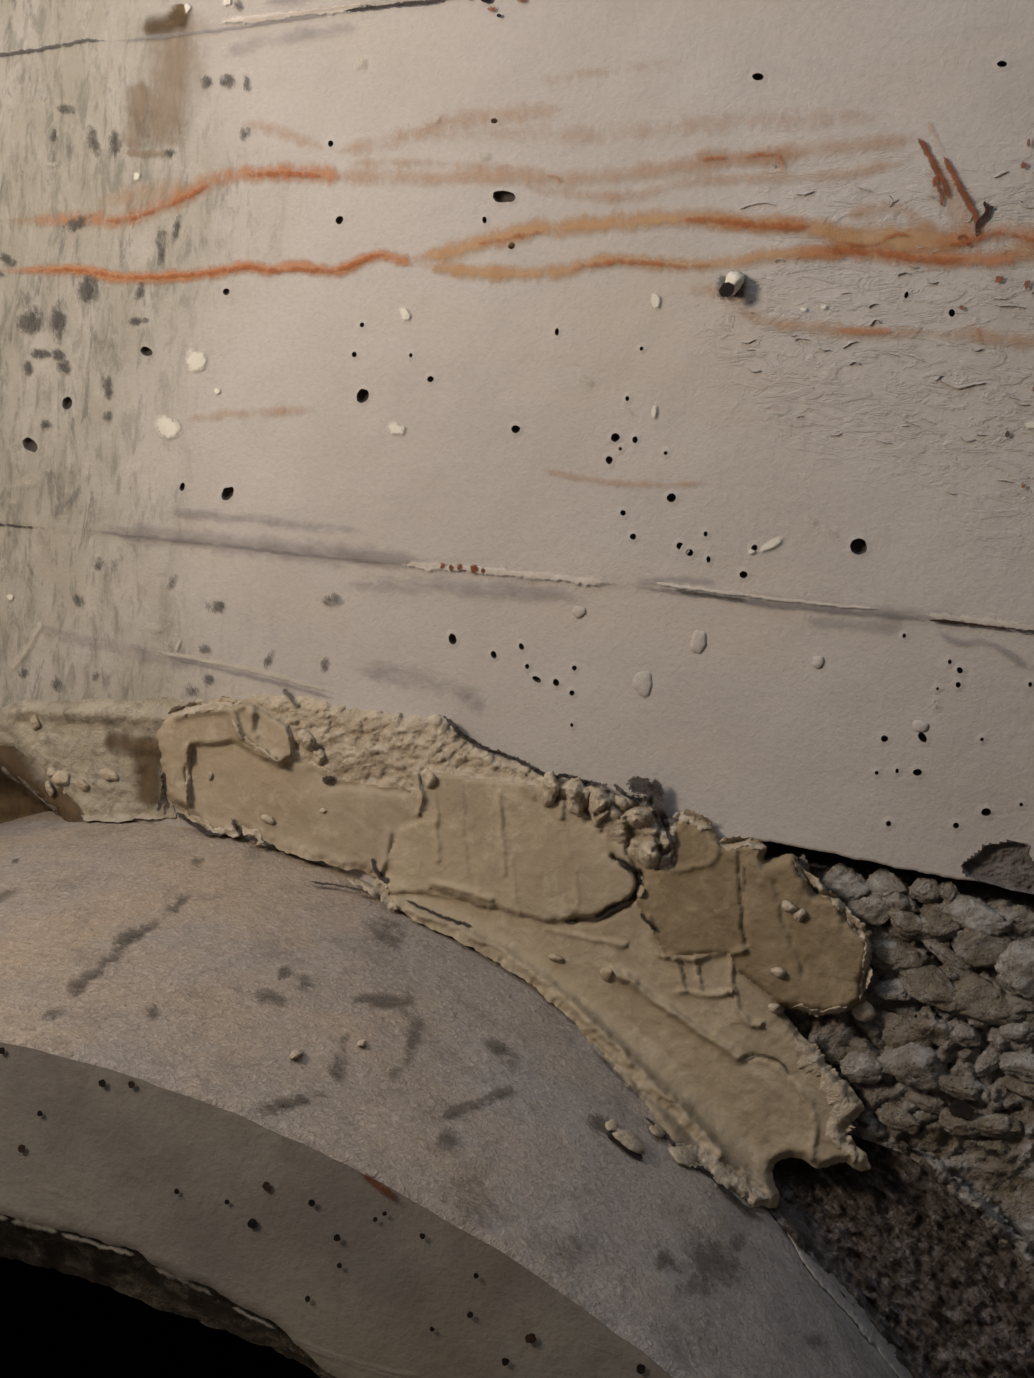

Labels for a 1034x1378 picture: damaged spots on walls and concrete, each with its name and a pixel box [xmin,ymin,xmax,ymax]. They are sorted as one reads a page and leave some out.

water stain [144,4,187,34]
crack [0,0,442,56]
crack [481,0,525,18]
corrosion [51,165,335,225]
corrosion [21,250,408,283]
corrosion [427,211,1034,283]
crack [109,532,294,554]
crack [348,558,606,586]
crack [648,582,1034,634]
spalling [761,841,1034,1260]